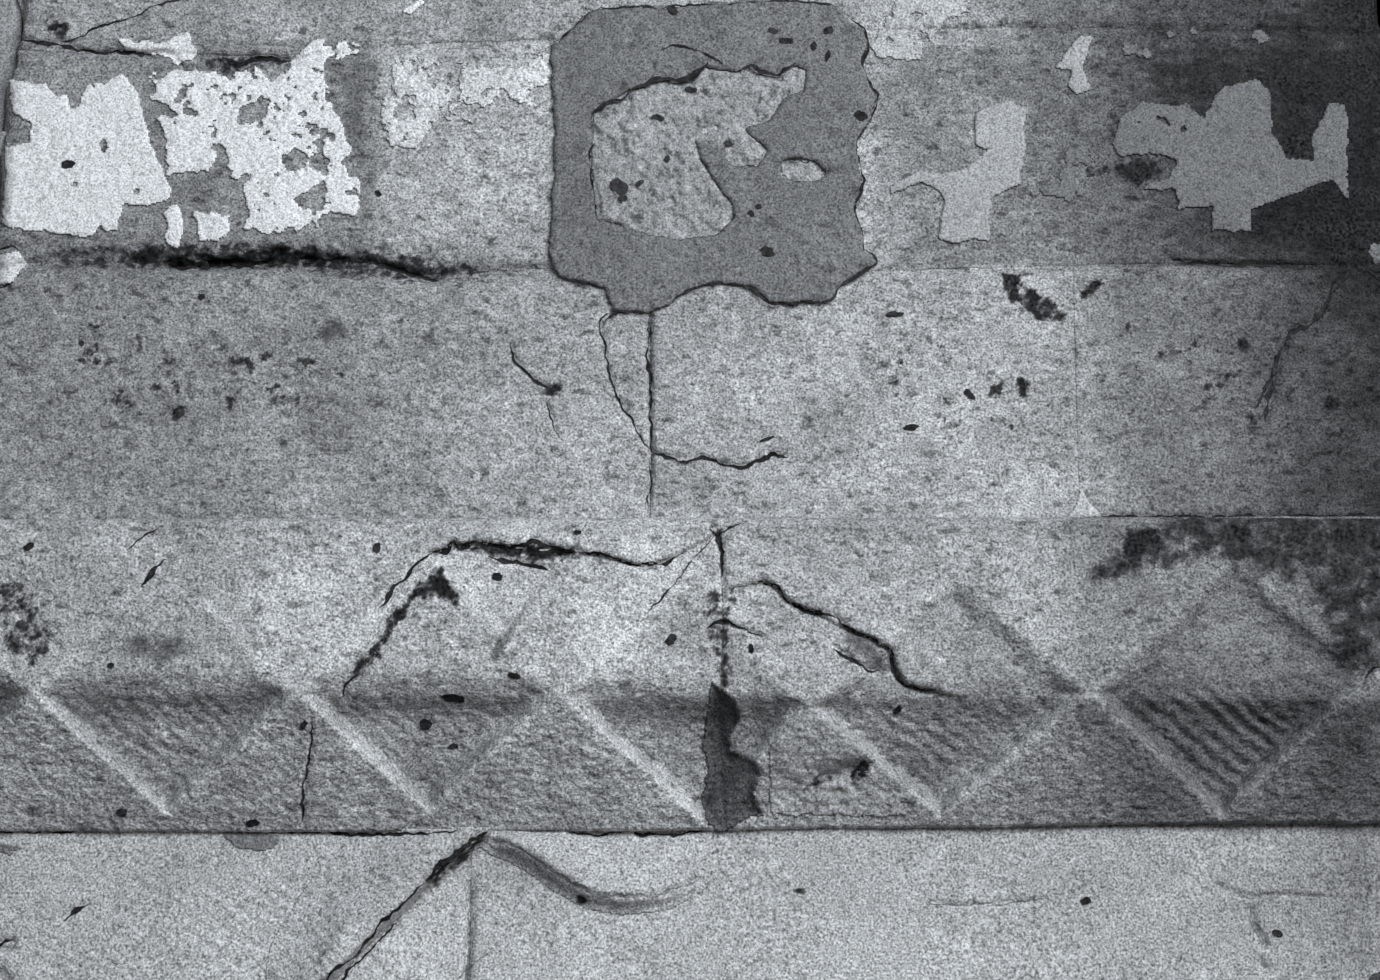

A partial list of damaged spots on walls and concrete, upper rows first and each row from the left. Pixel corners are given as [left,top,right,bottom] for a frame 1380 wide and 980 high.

peeling [2,32,360,248]
peeling [890,101,1027,243]
peeling [1112,79,1349,232]
peeling [0,250,26,285]
crack [555,0,880,512]
crack [1102,511,1380,519]
crack [378,523,936,692]
crack [342,674,360,696]
crack [0,828,77,836]
crack [237,723,709,980]